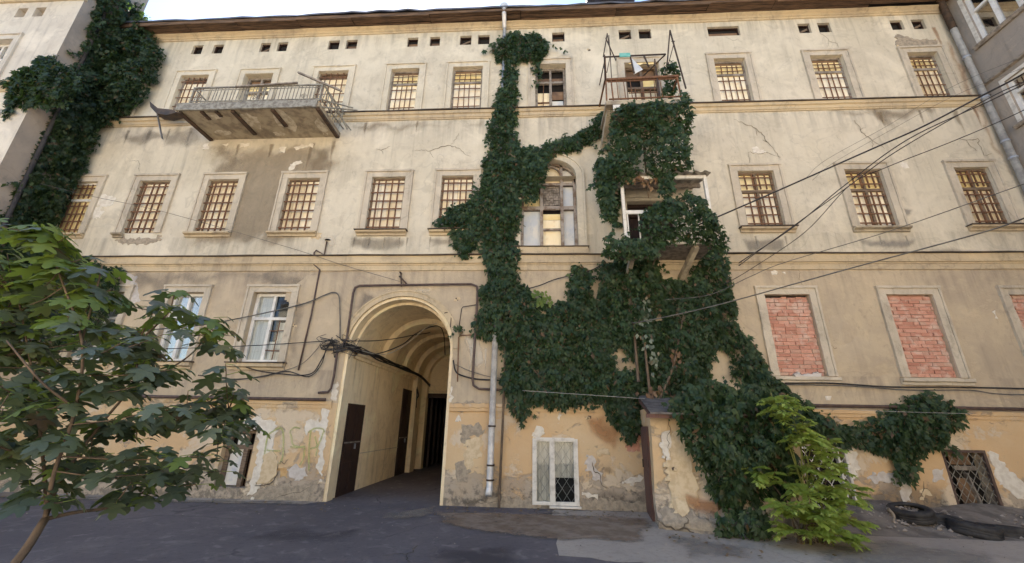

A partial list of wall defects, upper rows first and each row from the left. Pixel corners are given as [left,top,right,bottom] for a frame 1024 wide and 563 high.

flaking render [241,382,339,502]
peeling [448,387,490,482]
peeling [580,430,723,535]
flaking render [844,448,945,502]
peeling [987,451,1024,499]